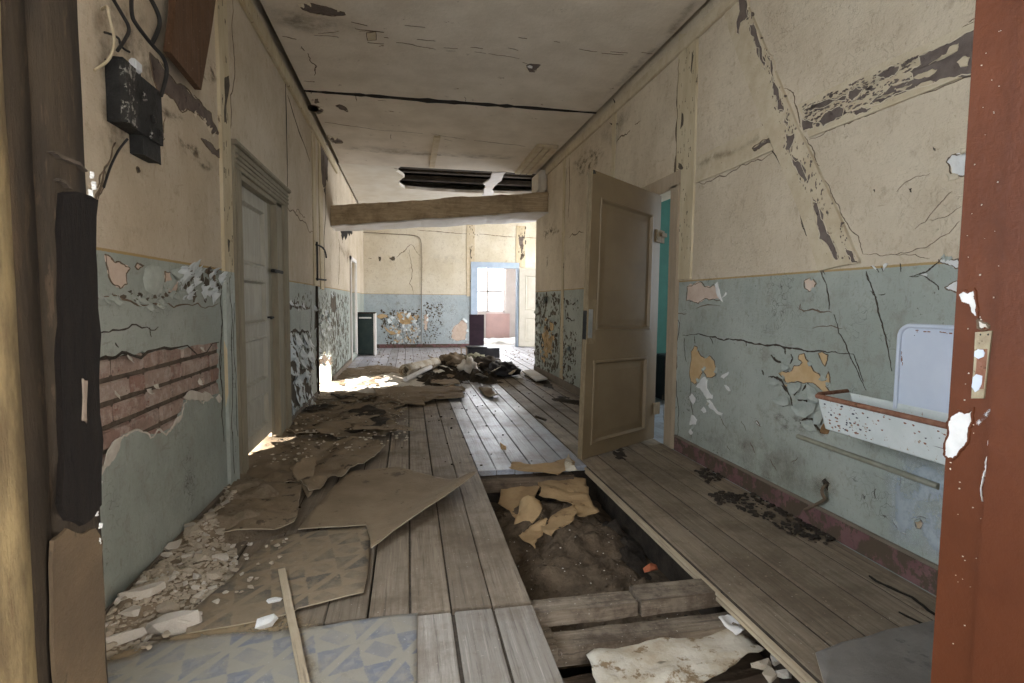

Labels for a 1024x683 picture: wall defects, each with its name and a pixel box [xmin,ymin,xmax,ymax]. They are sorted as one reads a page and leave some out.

peeling [149,52,230,173]
peeling [736,0,986,270]
flaking render [99,342,222,482]
peeling [98,236,233,312]
crack [100,278,238,474]
peeling [290,291,349,415]
peeling [377,302,469,344]
peeling [534,292,579,384]
peeling [689,346,732,435]
crack [662,271,866,433]
crack [784,88,960,371]
peeling [943,399,975,470]